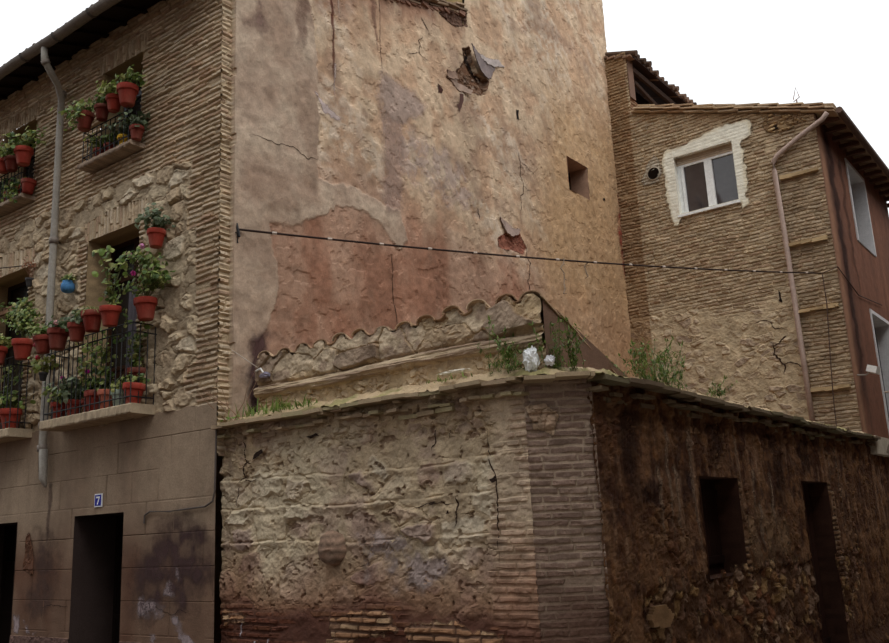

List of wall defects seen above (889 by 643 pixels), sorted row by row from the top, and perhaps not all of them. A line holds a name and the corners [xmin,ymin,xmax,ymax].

flaking render [446,43,504,111]
peeling [498,217,526,254]
crack [756,320,801,372]
damp [136,518,211,643]
flaking render [329,609,504,643]
flaking render [638,553,822,643]